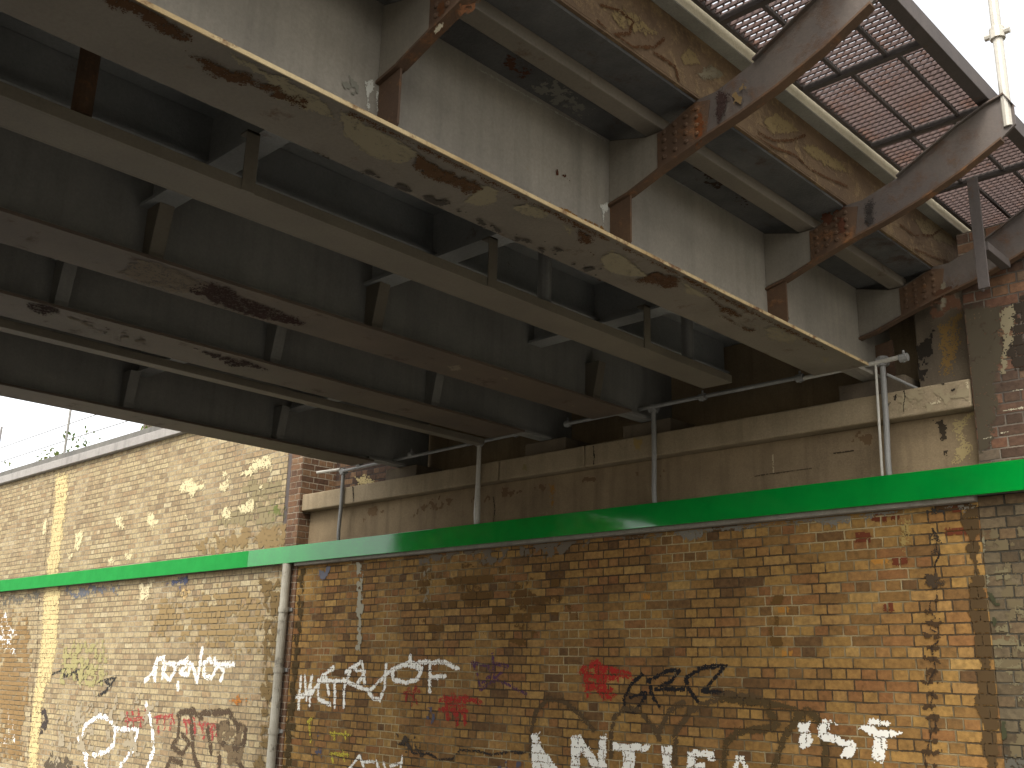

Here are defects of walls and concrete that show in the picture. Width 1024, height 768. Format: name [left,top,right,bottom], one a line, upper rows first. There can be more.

rust [105,0,308,109]
rust [341,109,827,350]
rust [189,281,304,326]
peeling [999,304,1016,374]
peeling [179,454,272,520]
water stain [355,562,364,651]
water stain [920,572,945,768]